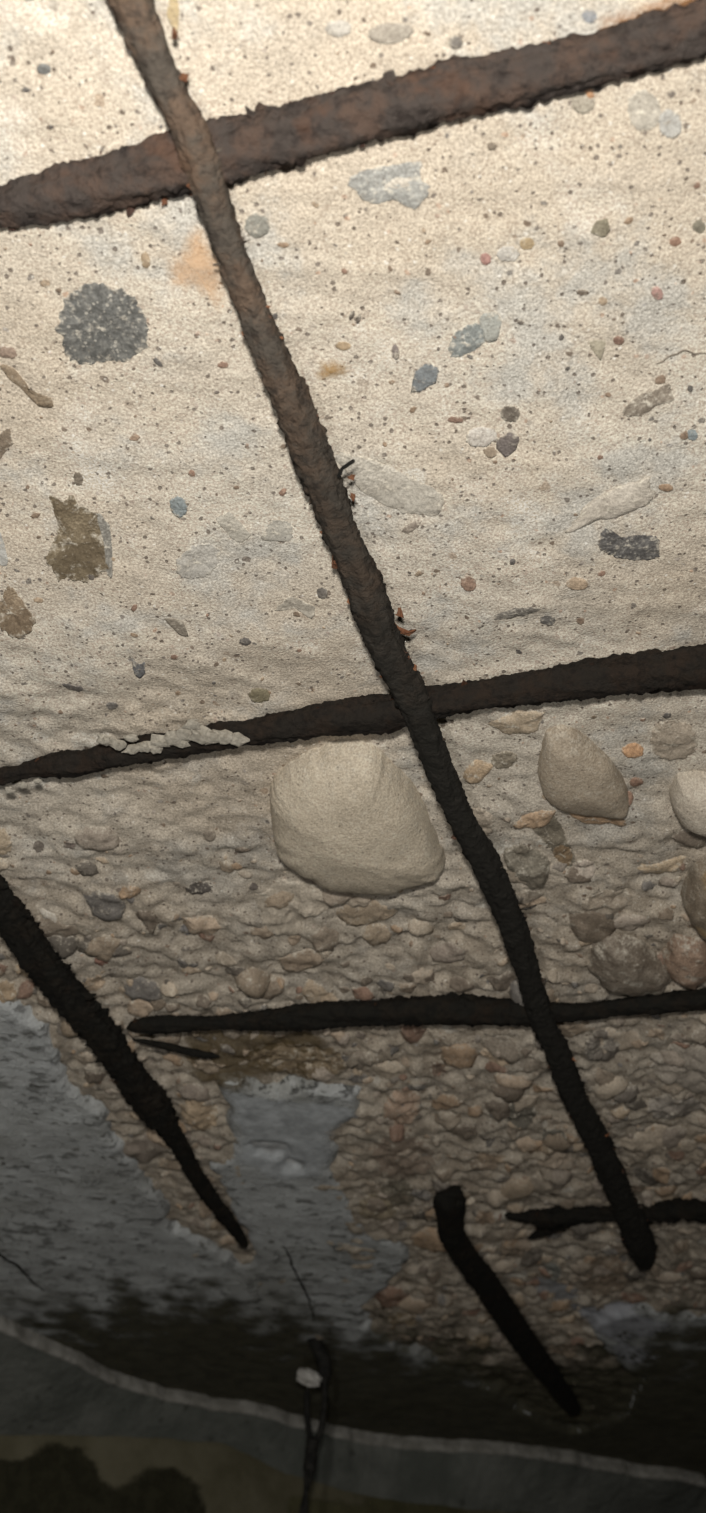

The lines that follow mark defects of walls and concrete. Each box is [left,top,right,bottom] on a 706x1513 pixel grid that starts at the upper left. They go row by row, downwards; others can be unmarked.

spalling [0,0,193,231]
spalling [0,194,406,786]
spalling [108,0,706,1271]
crack [0,1254,44,1291]
corrosion [186,1030,325,1088]
spalling [0,727,530,1265]
damp [228,1093,353,1179]
damp [15,1277,706,1476]
spalling [239,1024,706,1416]